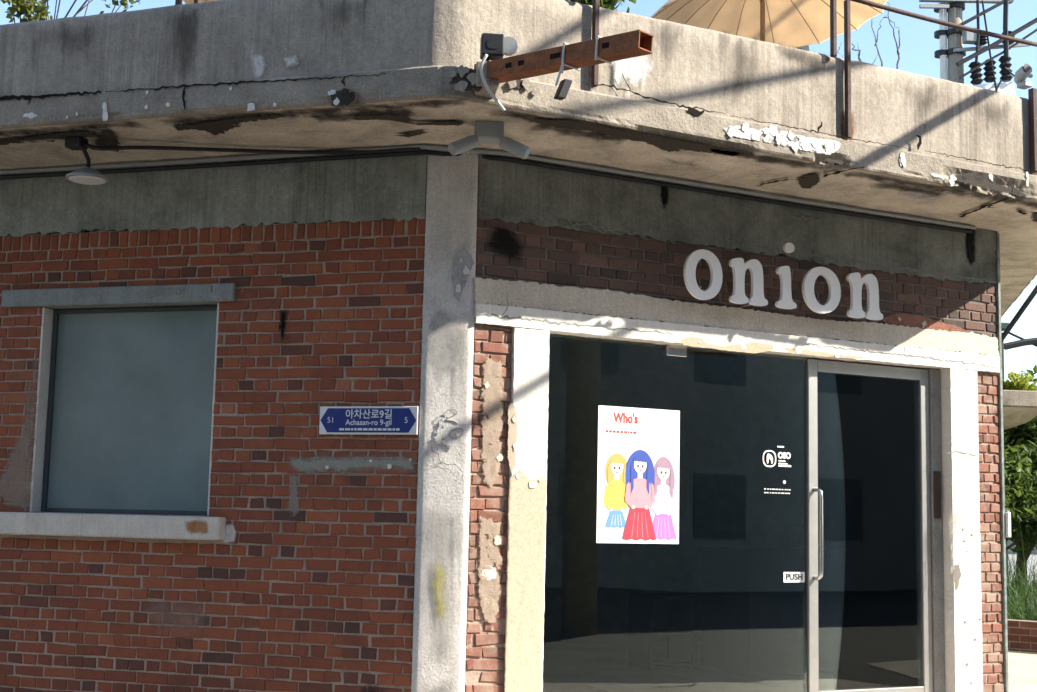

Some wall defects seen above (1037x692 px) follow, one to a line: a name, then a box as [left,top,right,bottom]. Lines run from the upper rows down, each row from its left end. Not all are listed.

crack [0,72,386,109]
crack [586,73,1035,172]
rust [842,112,854,140]
spalling [534,119,864,189]
spalling [948,172,1027,197]
crack [420,446,463,480]
rust [187,521,207,533]
peeling [478,357,546,692]